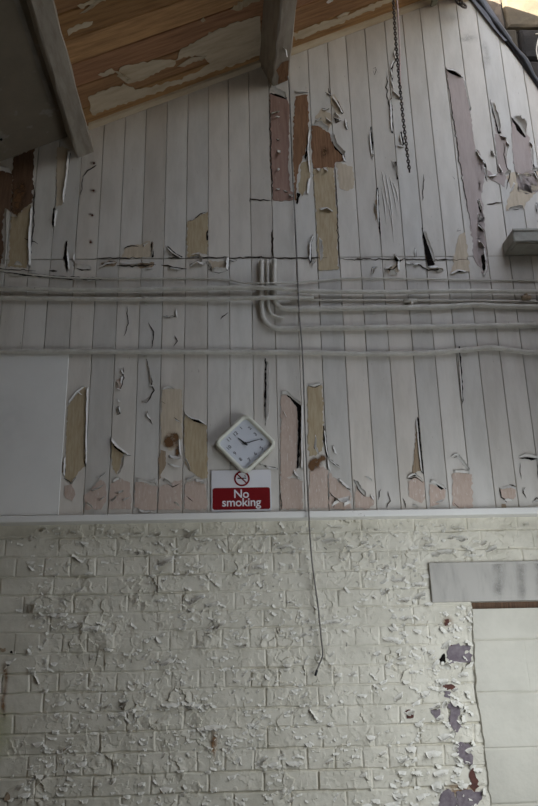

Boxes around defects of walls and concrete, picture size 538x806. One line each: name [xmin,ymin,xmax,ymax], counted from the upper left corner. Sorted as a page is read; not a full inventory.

peeling [67,0,106,36]
peeling [88,16,261,116]
peeling [0,149,38,268]
peeling [269,85,355,271]
peeling [371,67,538,276]
peeling [62,386,89,501]
peeling [158,386,208,511]
peeling [403,417,473,509]